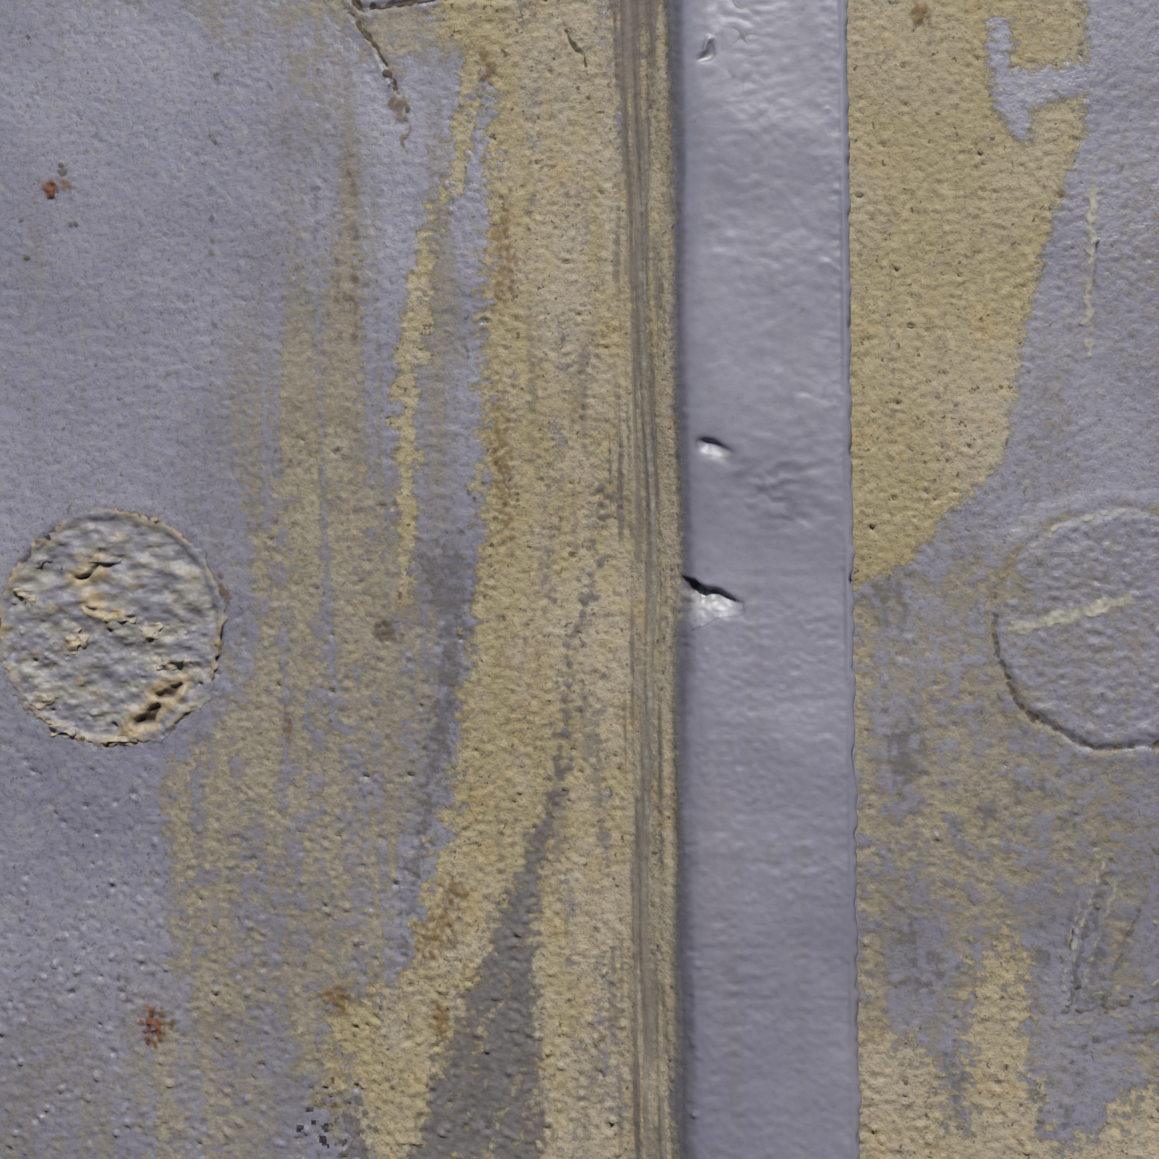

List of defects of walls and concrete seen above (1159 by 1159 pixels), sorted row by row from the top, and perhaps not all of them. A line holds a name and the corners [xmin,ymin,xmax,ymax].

peeling [0,0,745,1159]
crack [348,0,430,93]
crack [564,29,587,67]
peeling [847,0,1159,1159]